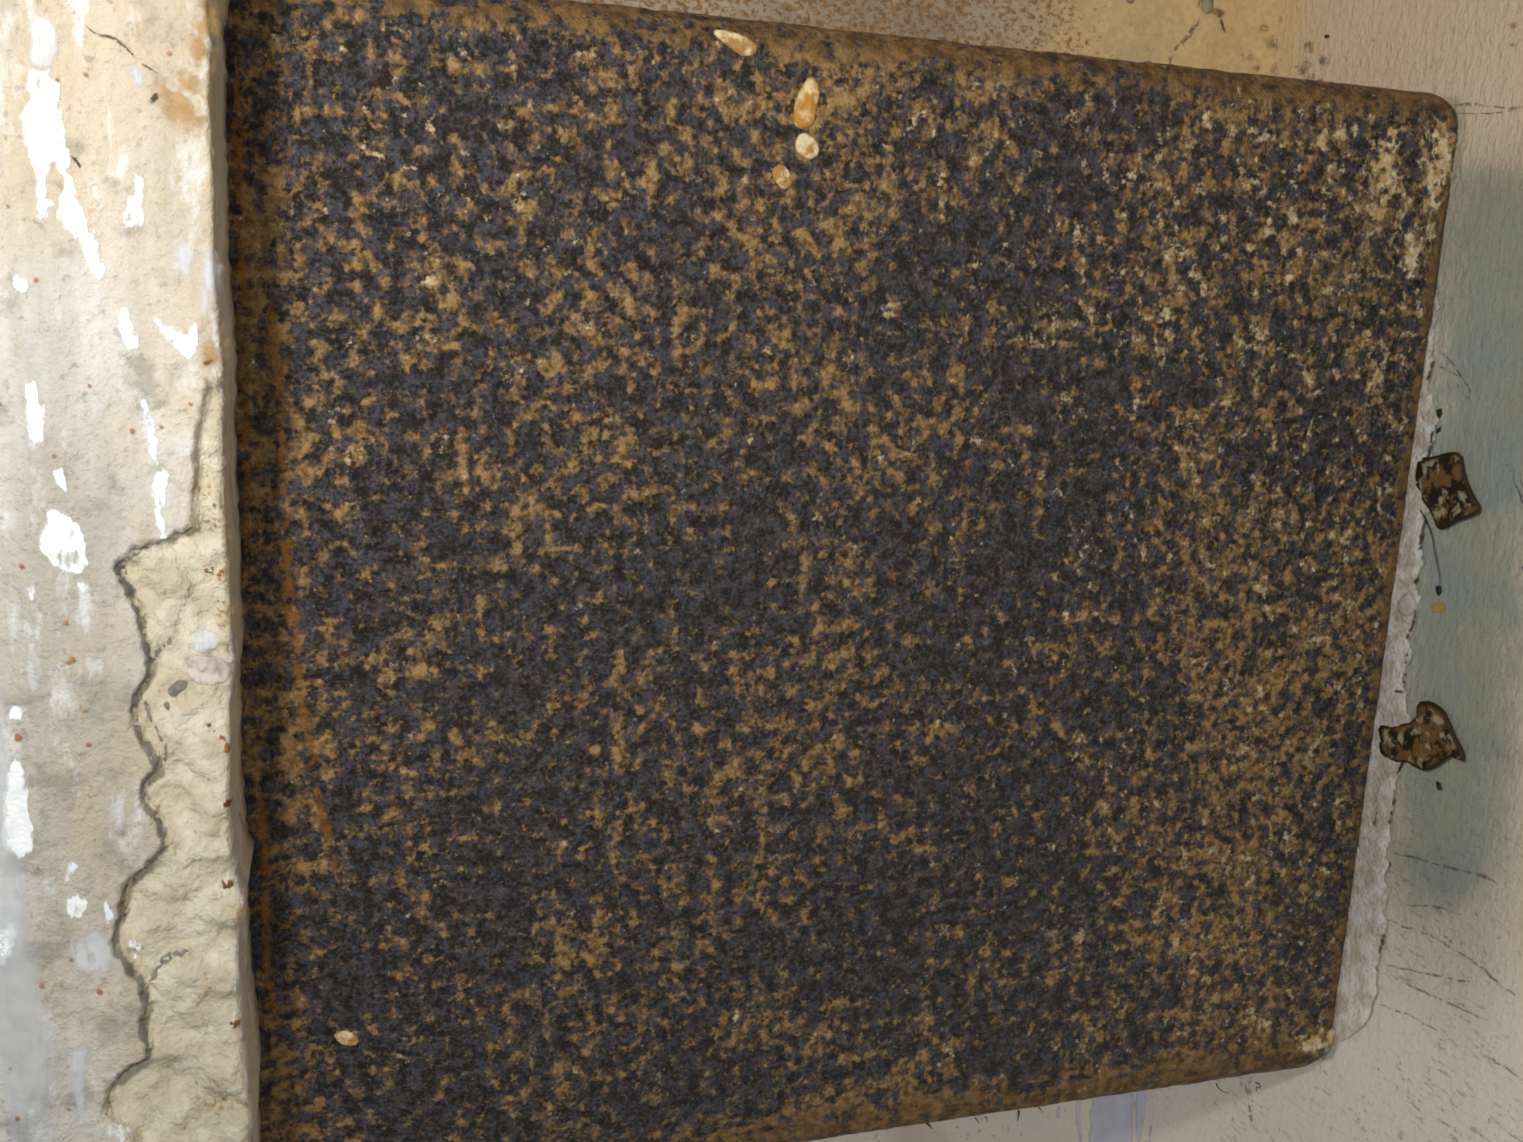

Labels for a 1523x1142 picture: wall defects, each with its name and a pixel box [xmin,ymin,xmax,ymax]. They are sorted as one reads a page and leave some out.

corrosion [570,0,1101,55]
crack [1169,1,1226,61]
corrosion [164,77,198,120]
efflorescence [1369,123,1456,231]
efflorescence [1396,231,1423,279]
corrosion [203,346,216,365]
corrosion [283,543,343,894]
spalling [107,377,249,1142]
corrosion [258,786,279,1024]